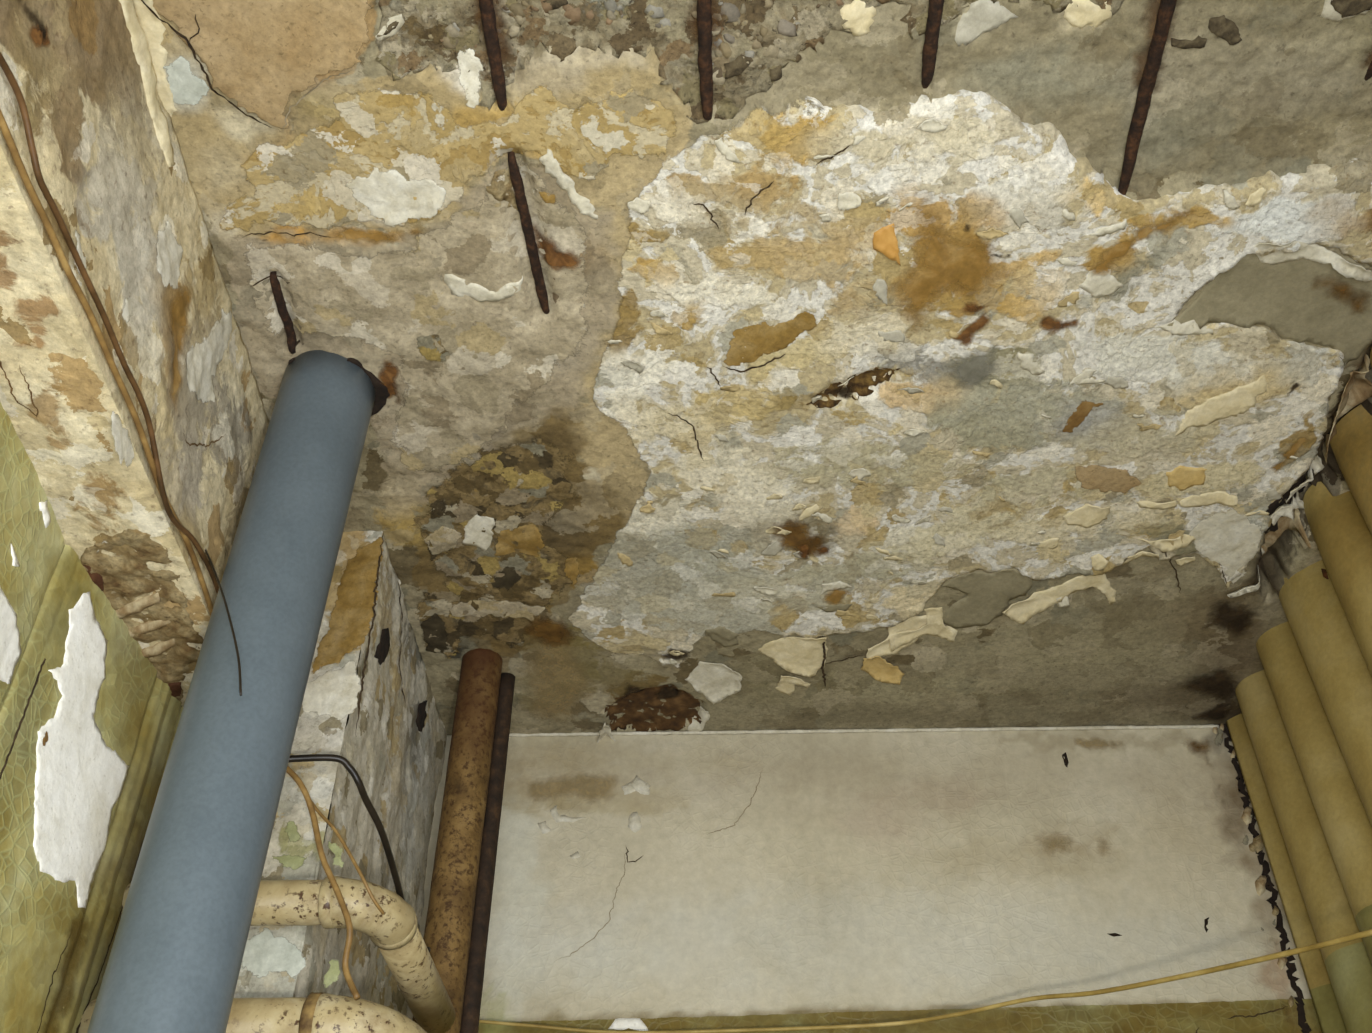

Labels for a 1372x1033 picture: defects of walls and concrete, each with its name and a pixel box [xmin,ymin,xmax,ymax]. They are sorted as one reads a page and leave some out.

peeling [132,0,209,117]
crack [141,0,359,132]
corrosion [533,227,579,270]
peeling [219,0,1372,732]
leakage [898,225,1010,345]
leakage [1040,316,1078,332]
leakage [413,436,584,717]
peeling [0,587,22,684]
peeling [33,529,204,908]
corrosion [604,684,703,732]
corrosion [663,649,688,660]
leakage [1186,670,1236,720]